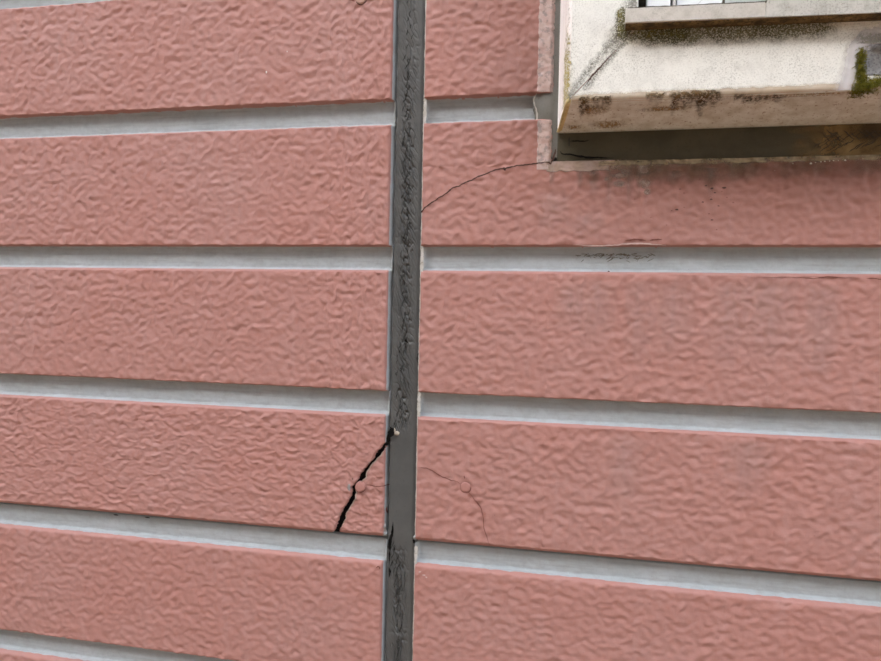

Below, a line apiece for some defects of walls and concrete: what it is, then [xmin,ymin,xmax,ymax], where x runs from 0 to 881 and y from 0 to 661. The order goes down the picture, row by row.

leakage [611,0,836,45]
leakage [841,30,881,90]
leakage [646,90,720,110]
crack [335,1,606,543]